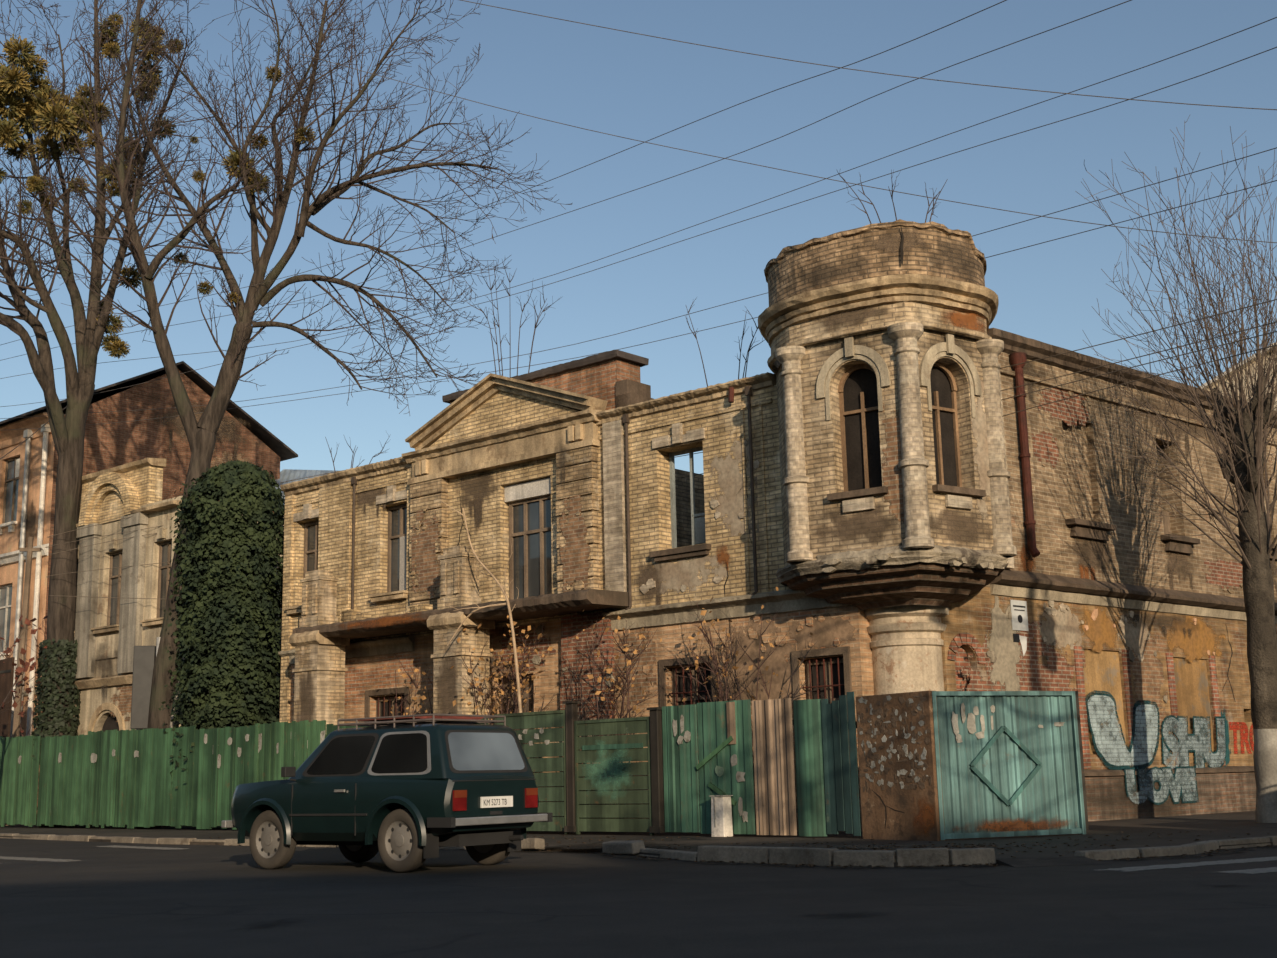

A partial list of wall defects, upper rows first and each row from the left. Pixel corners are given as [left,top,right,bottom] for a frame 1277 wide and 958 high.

peeling [640,555,727,595]
spalling [961,600,1226,721]
rust [978,820,1066,832]